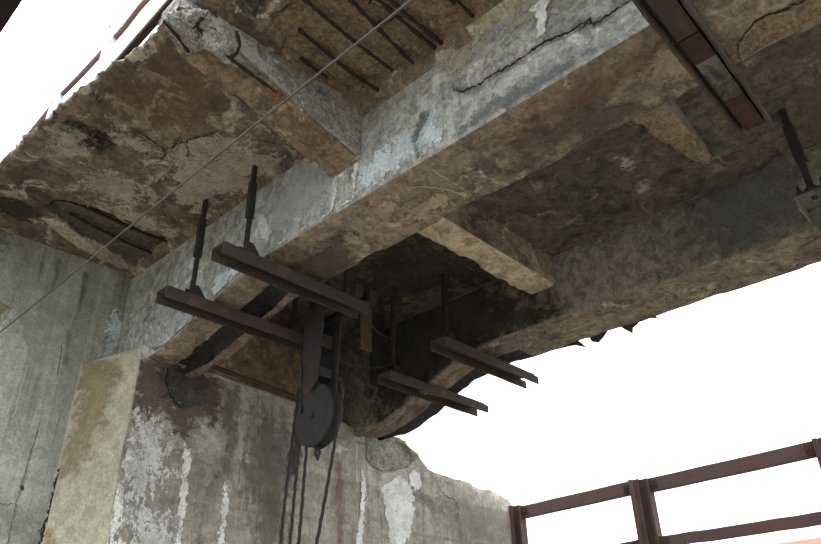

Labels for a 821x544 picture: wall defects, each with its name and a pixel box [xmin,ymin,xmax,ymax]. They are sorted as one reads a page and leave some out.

spalling [235,0,494,104]
peeling [438,0,632,91]
crack [451,0,631,93]
crack [740,0,805,43]
leakage [46,119,287,239]
spalling [41,200,169,269]
crack [0,421,41,544]
crack [38,460,62,544]
leakage [107,359,302,544]
leakage [356,469,367,544]
spalling [366,439,417,473]
leakage [379,469,422,544]